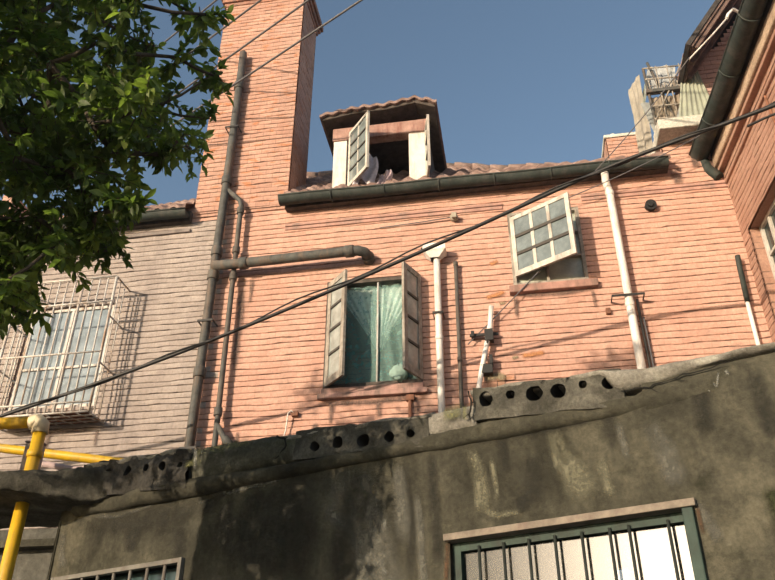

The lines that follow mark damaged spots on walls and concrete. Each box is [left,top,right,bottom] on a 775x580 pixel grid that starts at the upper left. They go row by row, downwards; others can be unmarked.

leakage [233,280,253,365]
leakage [470,453,538,518]
leakage [765,489,775,515]